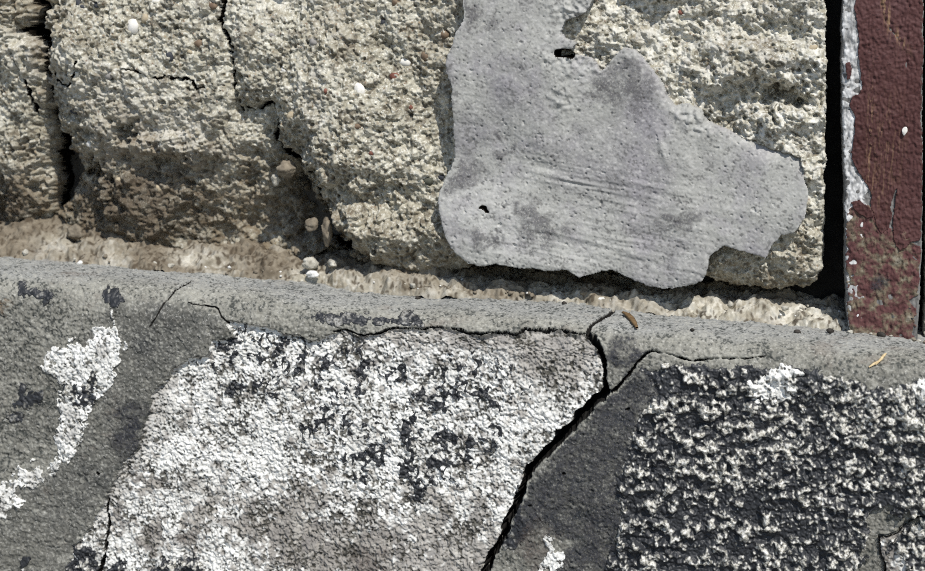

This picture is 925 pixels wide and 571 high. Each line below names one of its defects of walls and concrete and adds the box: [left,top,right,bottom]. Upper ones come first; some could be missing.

crack [14,0,78,206]
crack [125,69,205,90]
crack [217,0,354,254]
peeling [845,0,924,339]
peeling [102,285,125,325]
crack [149,281,230,327]
peeling [6,383,44,423]
peeling [47,371,98,477]
spalling [71,309,604,571]
crack [333,310,763,571]
peeling [880,525,910,571]
crack [878,516,922,571]